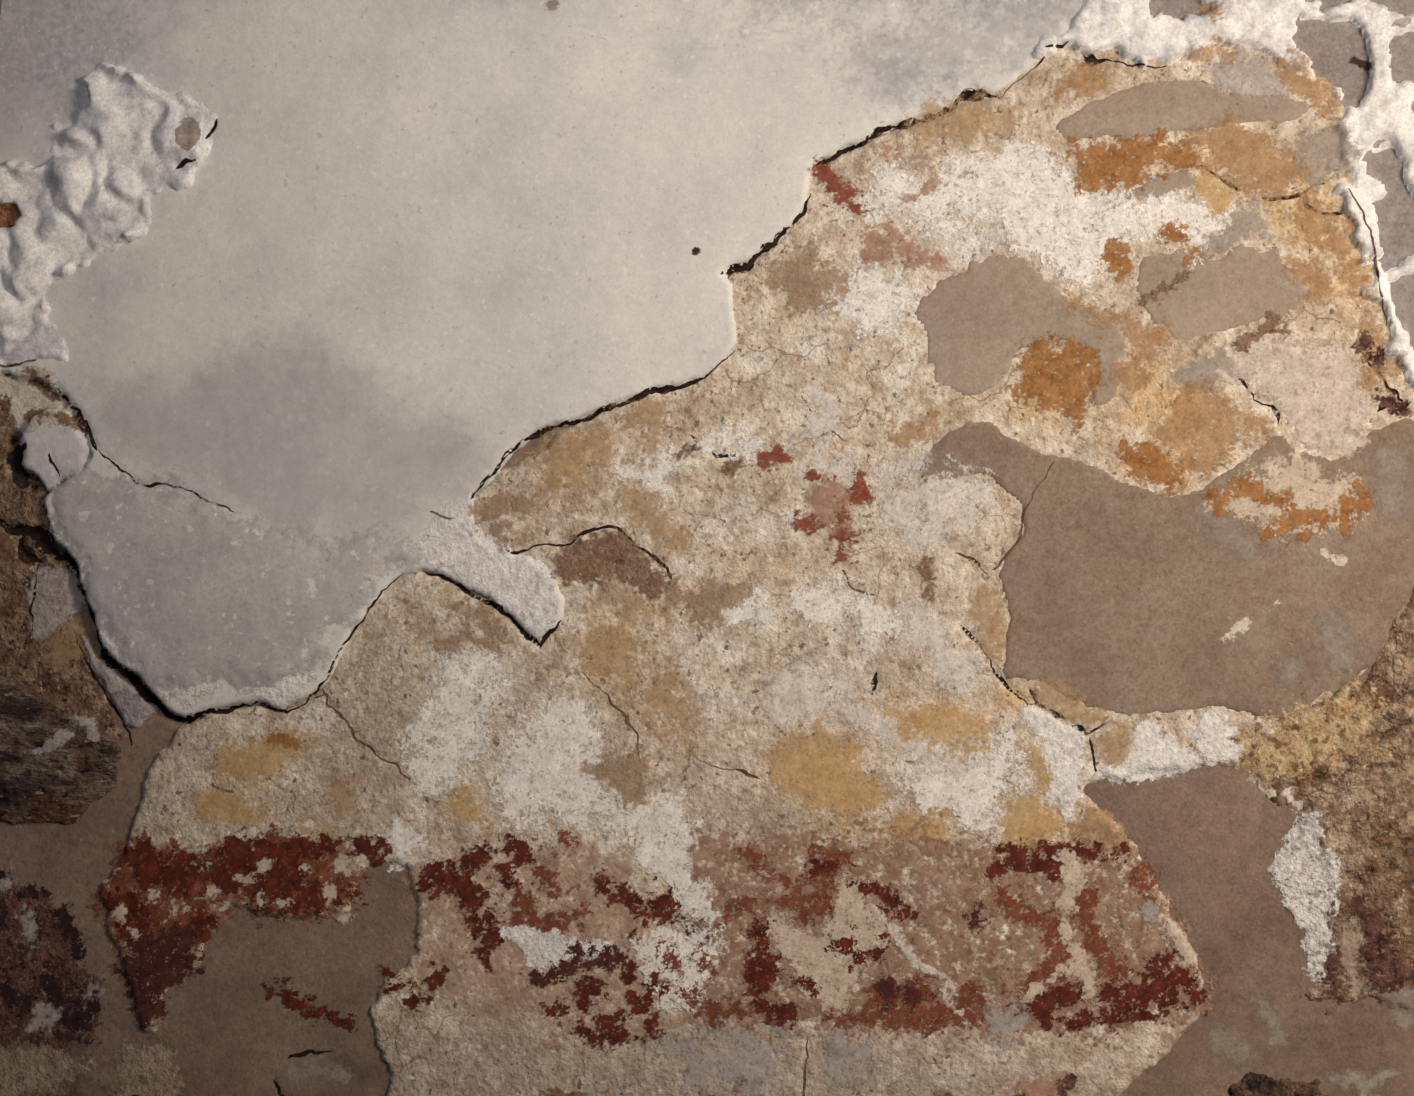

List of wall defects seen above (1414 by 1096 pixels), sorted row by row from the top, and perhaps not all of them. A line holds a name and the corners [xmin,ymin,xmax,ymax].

spalling [1350,57,1372,71]
peeling [175,117,201,151]
leakage [1293,118,1363,190]
peeling [853,131,1248,306]
leakage [1202,199,1272,259]
peeling [815,251,923,355]
crack [0,359,36,368]
leakage [1173,342,1234,395]
crack [48,453,61,477]
crack [57,387,234,512]
peeling [1202,310,1412,566]
peeling [0,366,1414,1096]